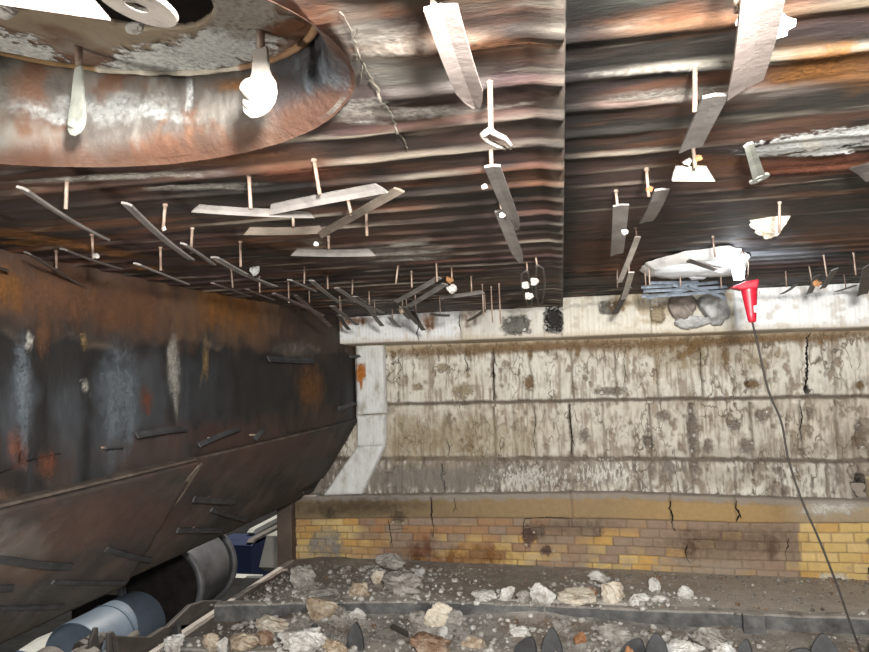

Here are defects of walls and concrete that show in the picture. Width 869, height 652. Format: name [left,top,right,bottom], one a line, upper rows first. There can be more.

crack [339,11,408,152]
water stain [16,353,28,414]
rust [356,364,366,389]
crack [459,315,498,400]
spalling [501,315,531,336]
spalling [542,306,563,334]
crack [797,333,811,439]
crack [531,389,575,454]
crack [430,438,458,538]
crack [668,501,690,563]